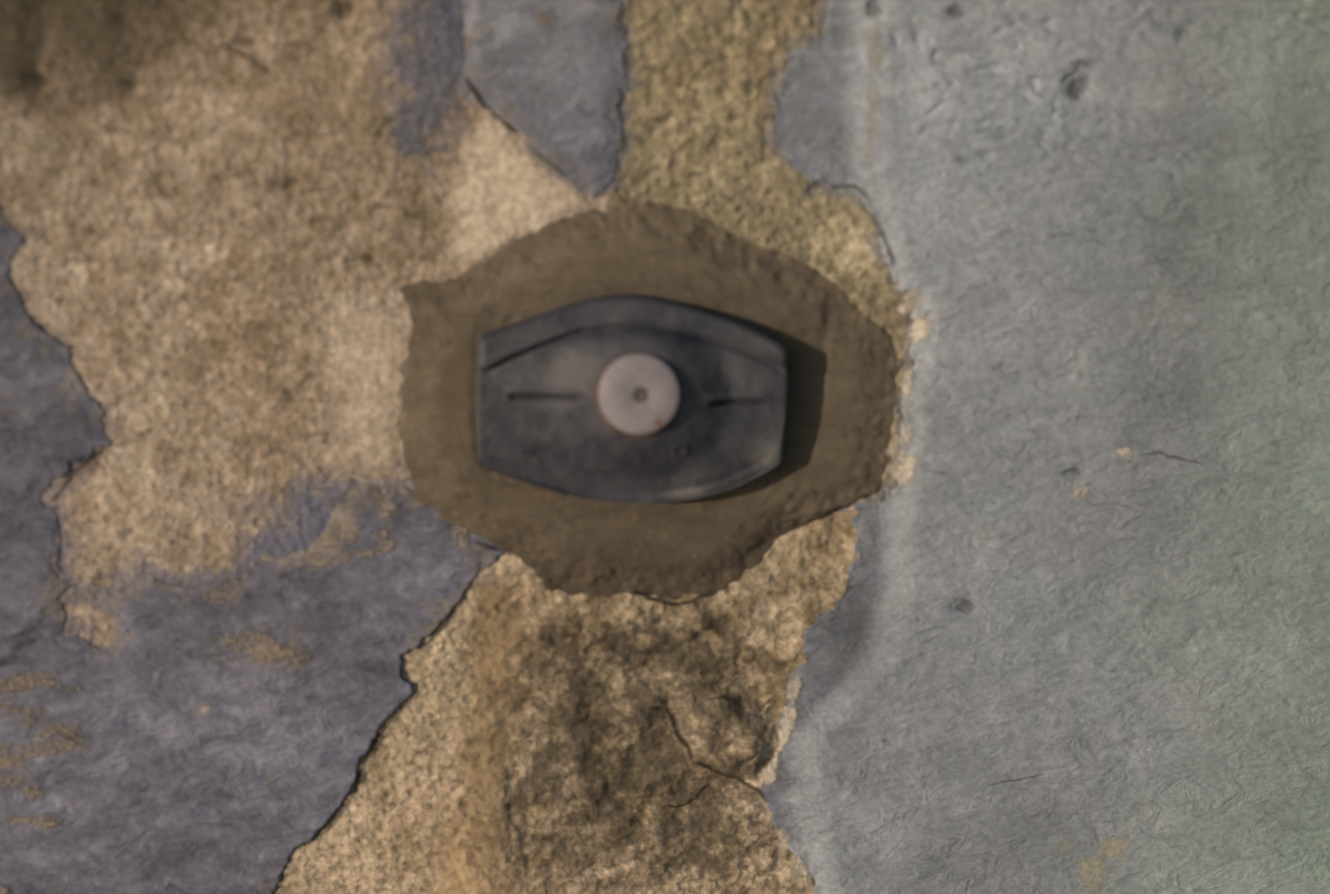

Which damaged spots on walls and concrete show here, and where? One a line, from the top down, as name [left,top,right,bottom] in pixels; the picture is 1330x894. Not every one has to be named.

crack [52,448,105,499]
peeling [0,0,928,894]
crack [652,696,764,808]